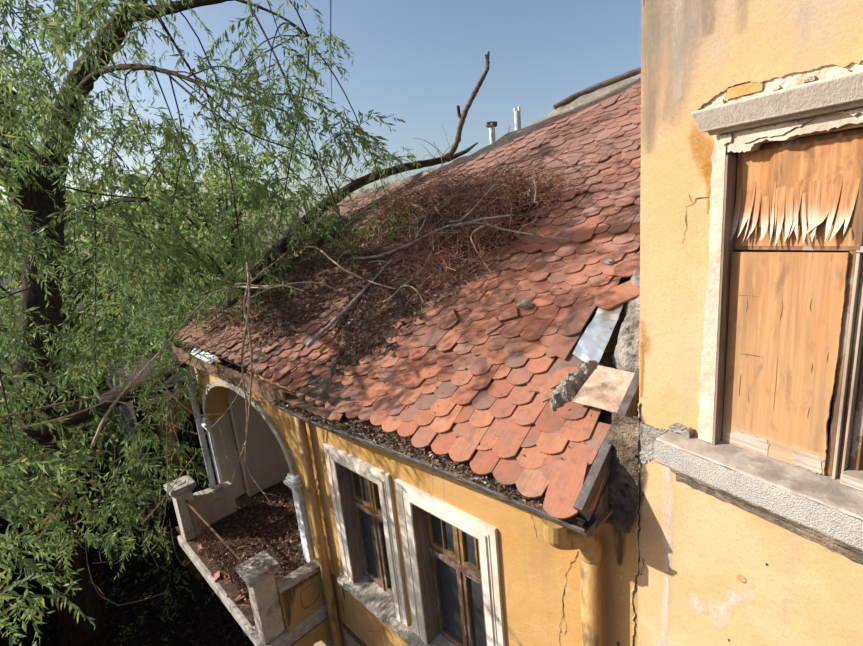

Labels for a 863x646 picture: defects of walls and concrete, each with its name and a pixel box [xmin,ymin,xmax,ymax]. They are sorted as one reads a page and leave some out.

flaking render [699,61,863,110]
flaking render [714,107,863,153]
crack [559,551,579,642]
crack [631,459,646,646]